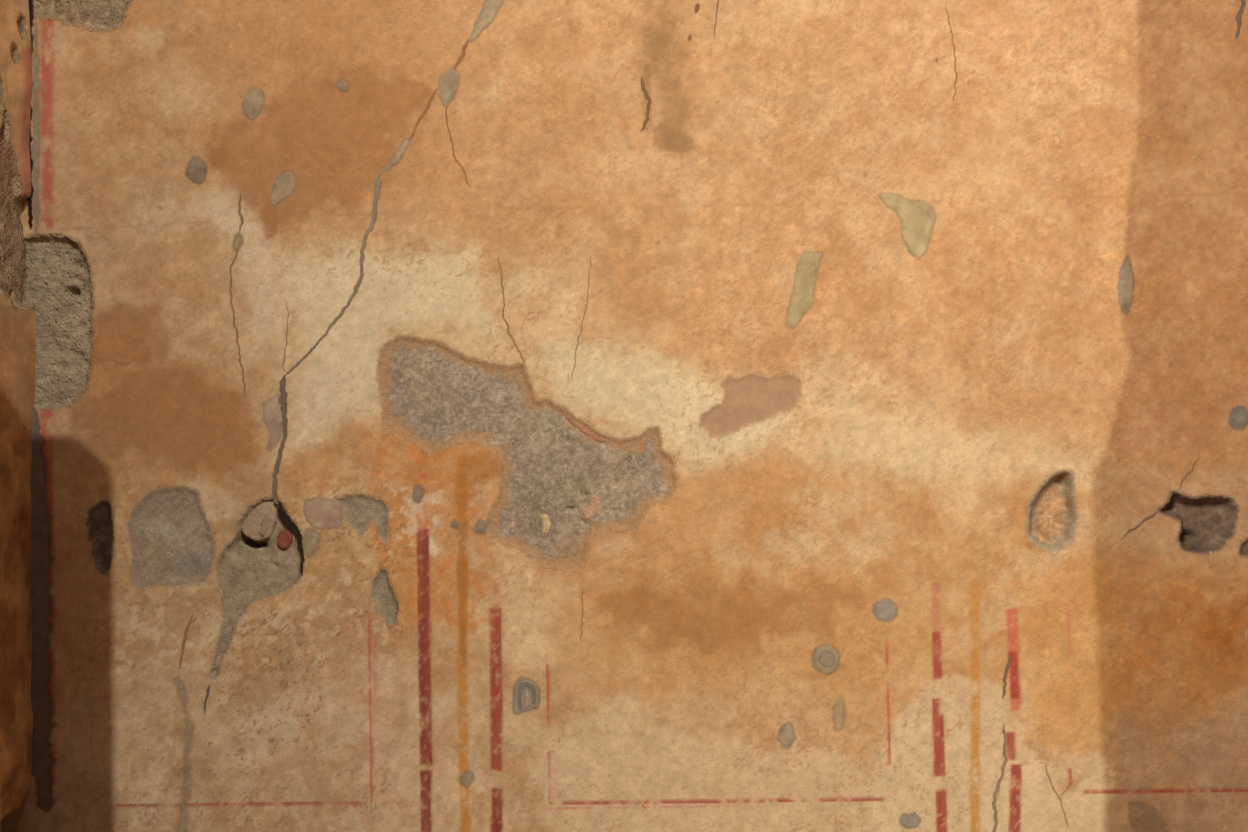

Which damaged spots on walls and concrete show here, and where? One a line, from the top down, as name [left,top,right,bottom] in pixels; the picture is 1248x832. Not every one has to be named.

crack [410,40,469,185]
flaking render [0,0,134,411]
flaking render [85,484,306,681]
crack [229,195,245,395]
crack [272,176,381,575]
crack [498,257,525,361]
flaking render [375,334,679,573]
peeling [697,371,803,439]
spalling [1025,468,1080,556]
spalling [1155,489,1248,559]
crack [203,685,211,711]
crack [992,654,1012,832]